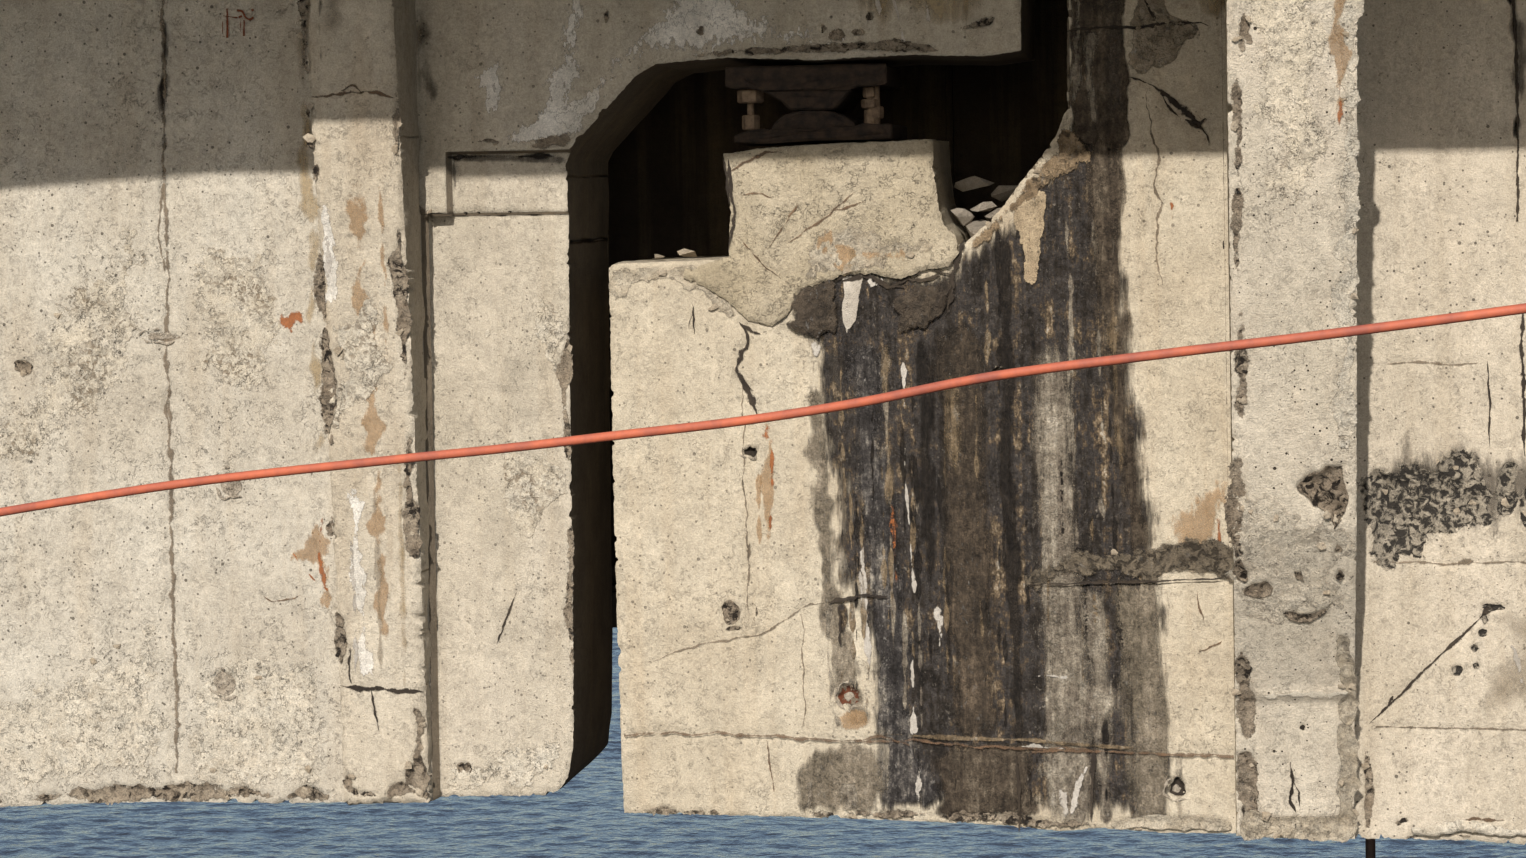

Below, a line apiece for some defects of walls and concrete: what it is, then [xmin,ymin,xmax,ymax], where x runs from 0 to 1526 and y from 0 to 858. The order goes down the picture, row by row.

spalling [972,128,1091,285]
crack [1131,67,1224,285]
spalling [1329,0,1364,448]
rust [293,553,328,591]
spalling [312,253,343,445]
rust [764,426,774,485]
crack [624,322,1234,831]
damp [798,0,1181,828]
spalling [1224,458,1356,626]
crack [1374,558,1526,566]
peeling [0,625,332,805]
crack [1369,607,1526,731]